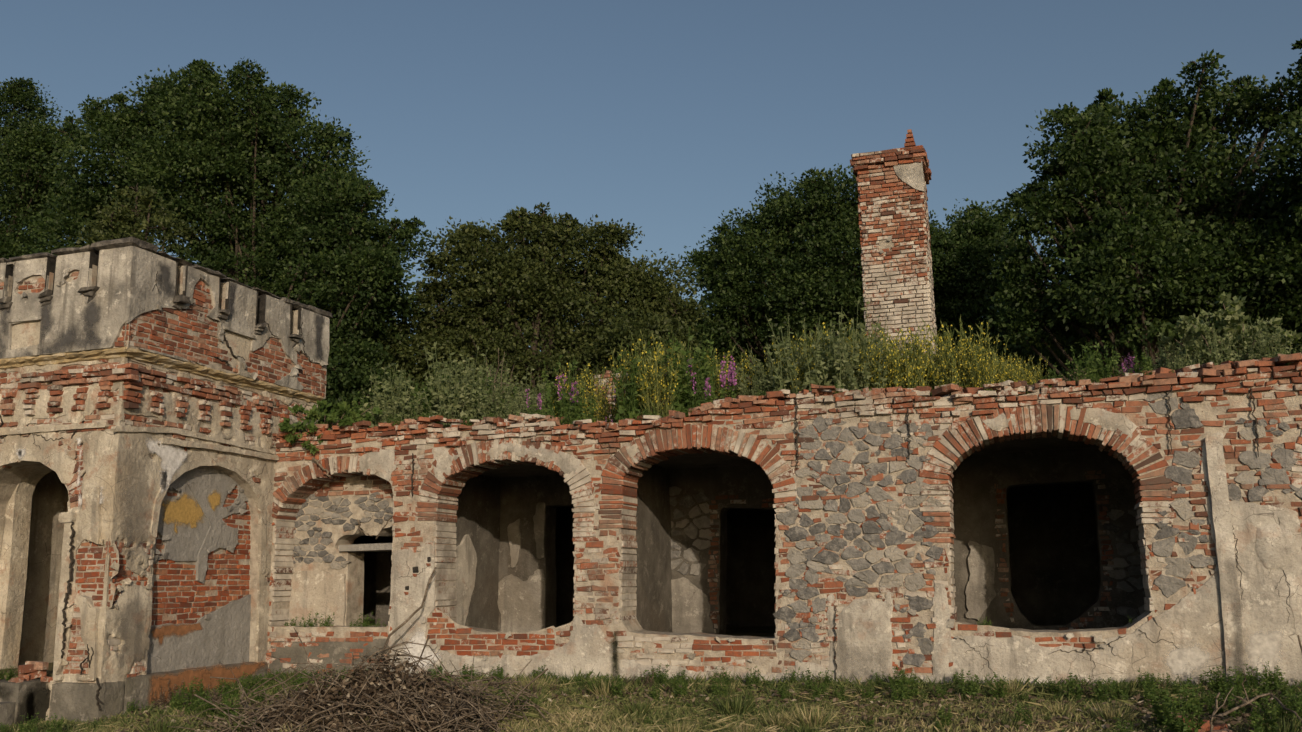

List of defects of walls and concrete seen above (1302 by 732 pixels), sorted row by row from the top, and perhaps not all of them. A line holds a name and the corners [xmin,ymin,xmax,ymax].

spalling [115,274,328,399]
crack [214,335,245,365]
crack [265,322,313,361]
spalling [58,484,251,675]
crack [1232,525,1291,623]